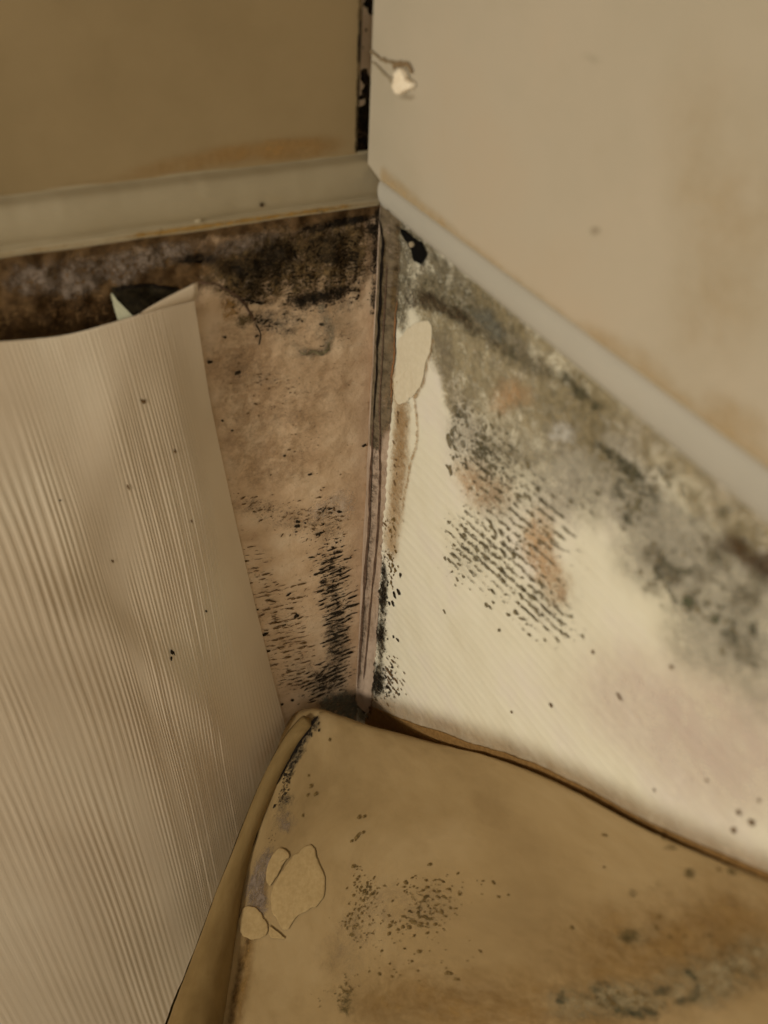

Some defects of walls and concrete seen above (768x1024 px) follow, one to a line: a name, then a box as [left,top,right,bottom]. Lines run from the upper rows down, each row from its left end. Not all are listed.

spalling [400,228,427,266]
peeling [393,320,432,404]
leakage [0,205,768,881]
peeling [238,844,325,940]
leakage [334,864,539,1022]
leakage [556,896,768,1023]